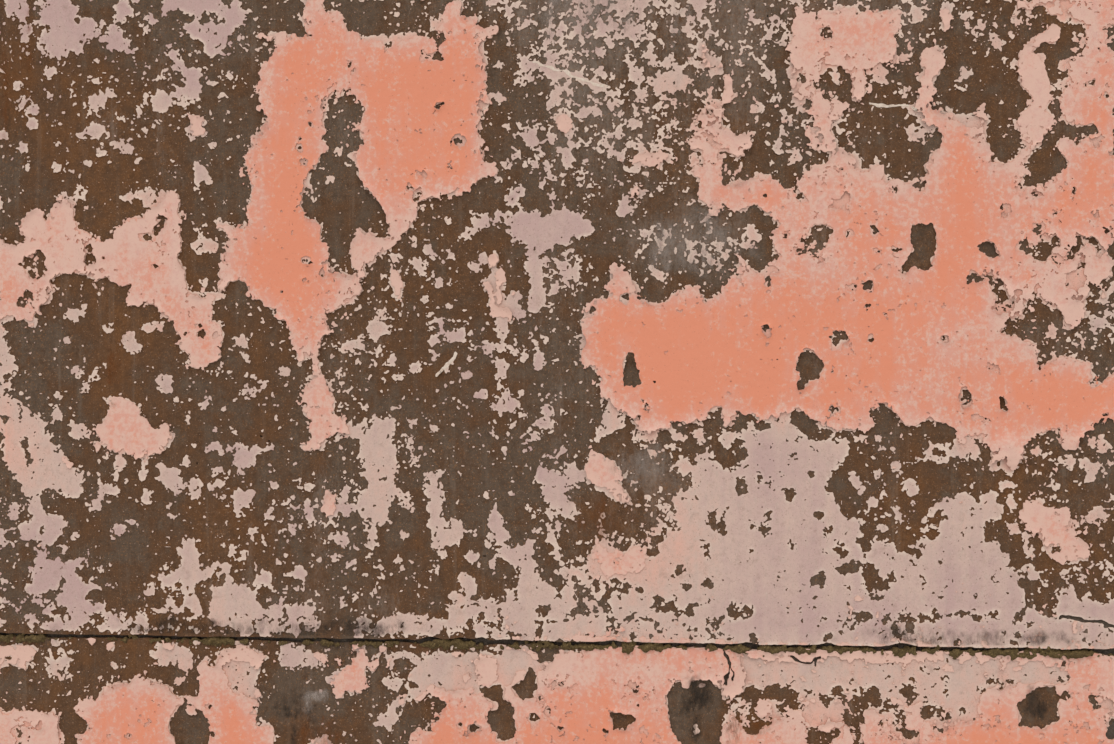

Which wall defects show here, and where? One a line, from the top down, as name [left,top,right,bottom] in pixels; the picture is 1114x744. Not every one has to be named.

spalling [817,24,833,42]
peeling [138,211,169,270]
peeling [790,211,838,264]
peeling [18,249,47,284]
spalling [837,223,937,303]
peeling [962,203,1114,399]
peeling [823,327,854,355]
spalling [622,352,641,388]
spalling [795,348,835,394]
crack [1056,613,1114,633]
spalling [573,708,661,744]
crack [1106,721,1114,740]